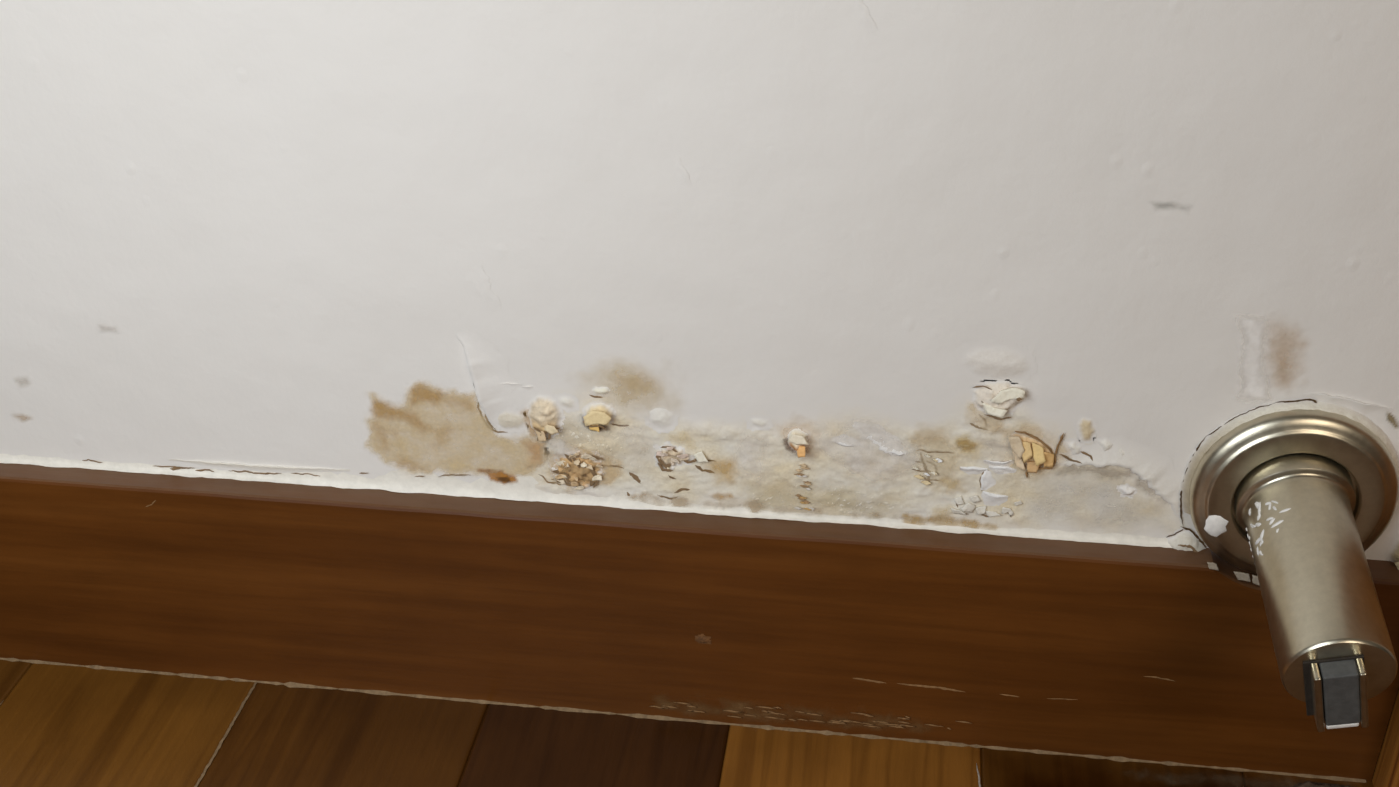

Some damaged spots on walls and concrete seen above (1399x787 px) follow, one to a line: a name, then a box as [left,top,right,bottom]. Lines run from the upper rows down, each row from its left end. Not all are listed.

crack [455,329,533,433]
spalling [539,448,641,496]
spalling [653,441,714,500]
water stain [370,376,1196,538]
peeling [950,430,1189,519]